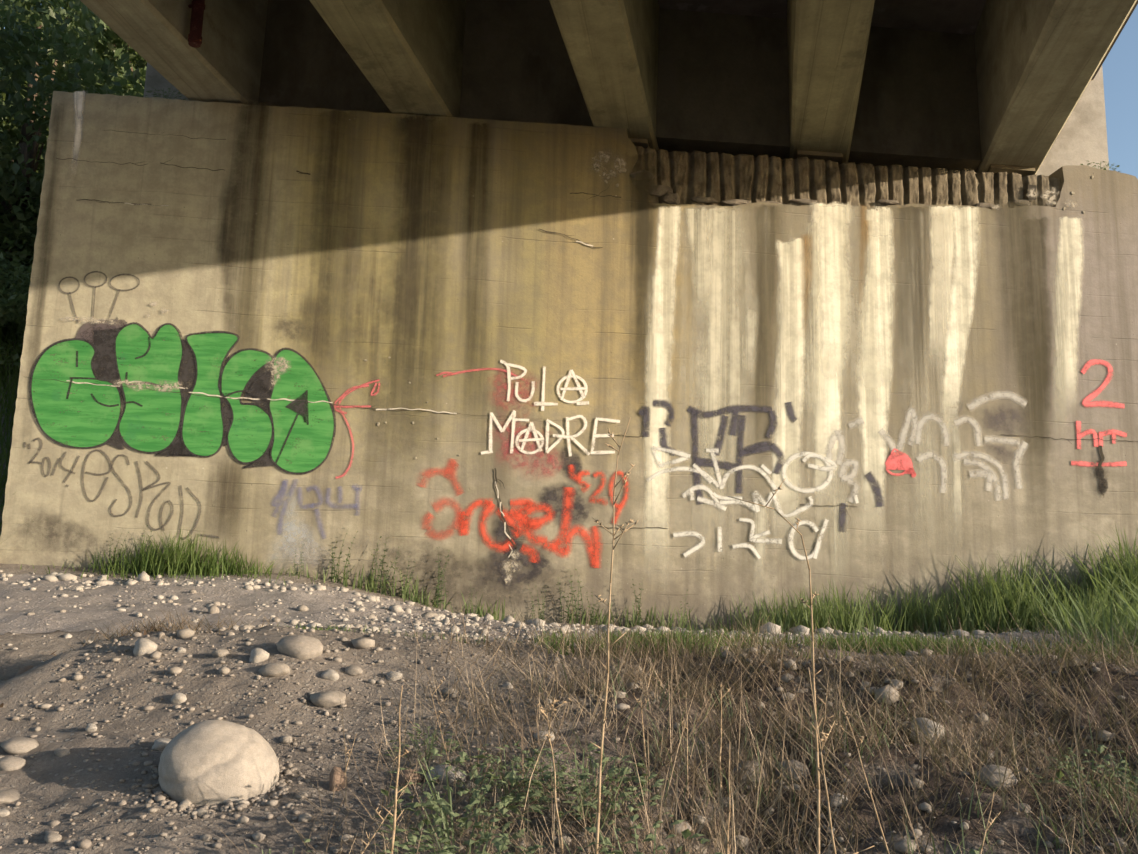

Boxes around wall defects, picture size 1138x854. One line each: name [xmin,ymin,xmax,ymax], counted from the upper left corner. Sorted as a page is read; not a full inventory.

leakage [217,473,235,517]
leakage [280,111,341,352]
crack [27,377,642,437]
leakage [390,116,437,395]
crack [494,468,517,574]
leakage [636,153,849,562]
spalling [592,146,1085,214]
leakage [858,206,978,496]
leakage [953,431,961,510]
leakage [1009,200,1082,440]